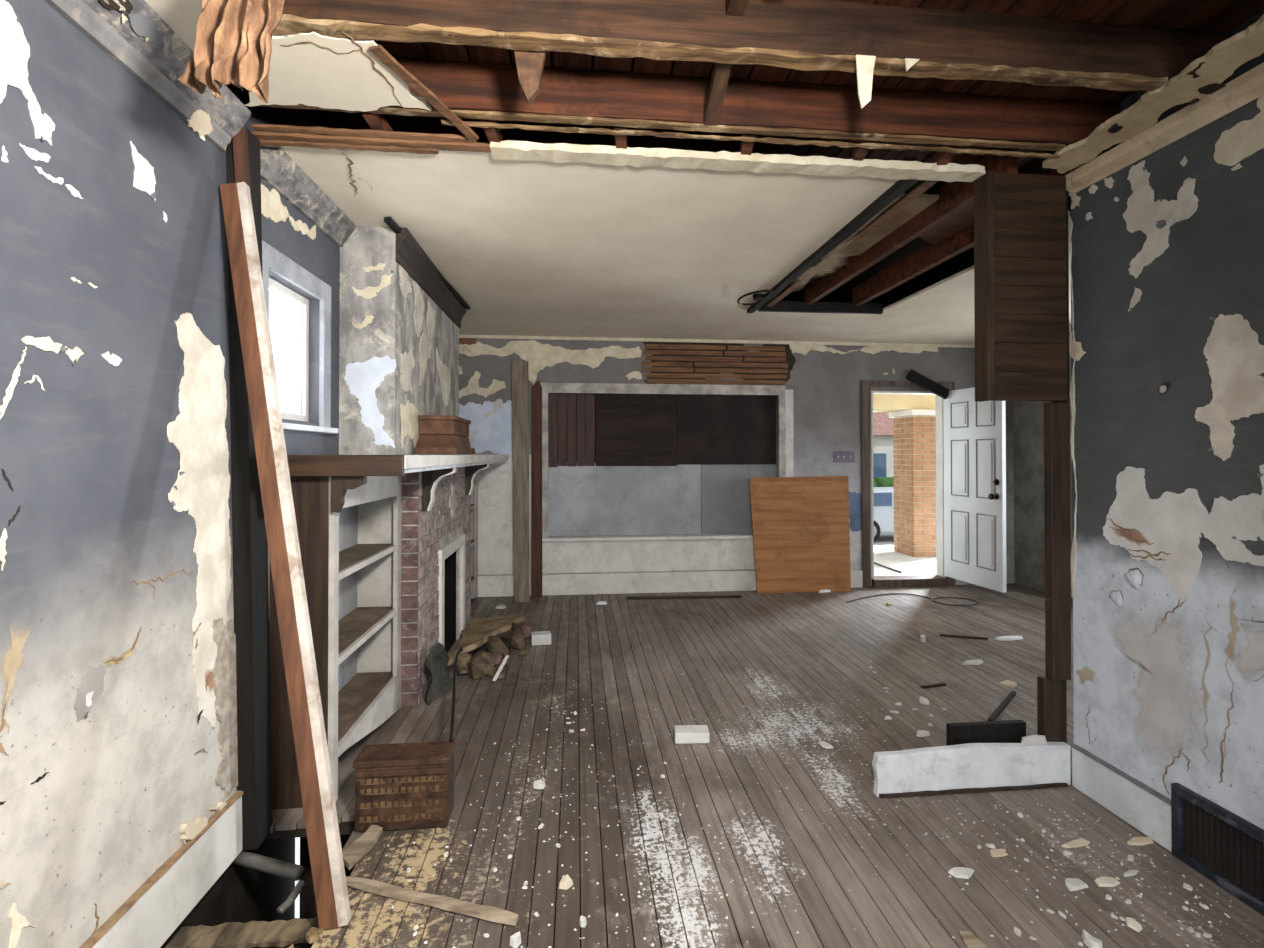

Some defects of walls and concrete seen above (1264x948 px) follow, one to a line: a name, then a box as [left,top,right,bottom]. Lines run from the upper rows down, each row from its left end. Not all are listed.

peeling [0,0,83,199]
spalling [1187,62,1226,105]
peeling [1214,95,1264,171]
peeling [0,336,84,419]
peeling [101,351,122,366]
flaking render [344,263,938,455]
peeling [1068,156,1198,597]
peeling [1195,314,1264,461]
peeling [167,313,238,844]
crack [1150,599,1186,638]
peeling [1103,464,1264,602]
crack [1163,734,1191,794]